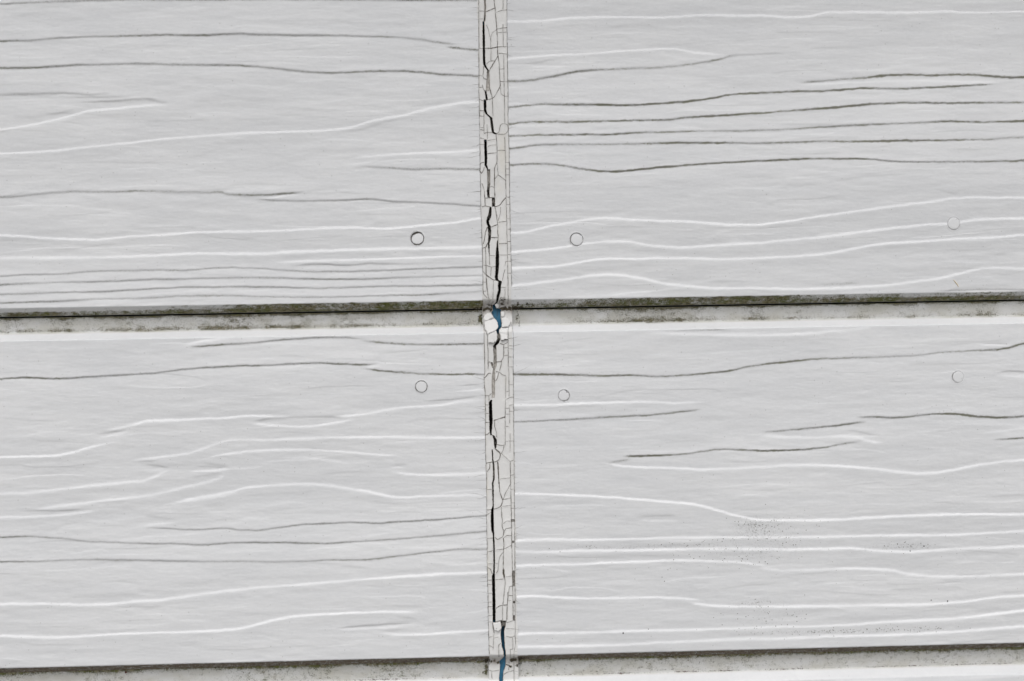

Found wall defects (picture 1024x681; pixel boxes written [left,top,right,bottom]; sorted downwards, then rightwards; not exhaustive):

crack [477,0,516,650]
peeling [484,303,511,343]